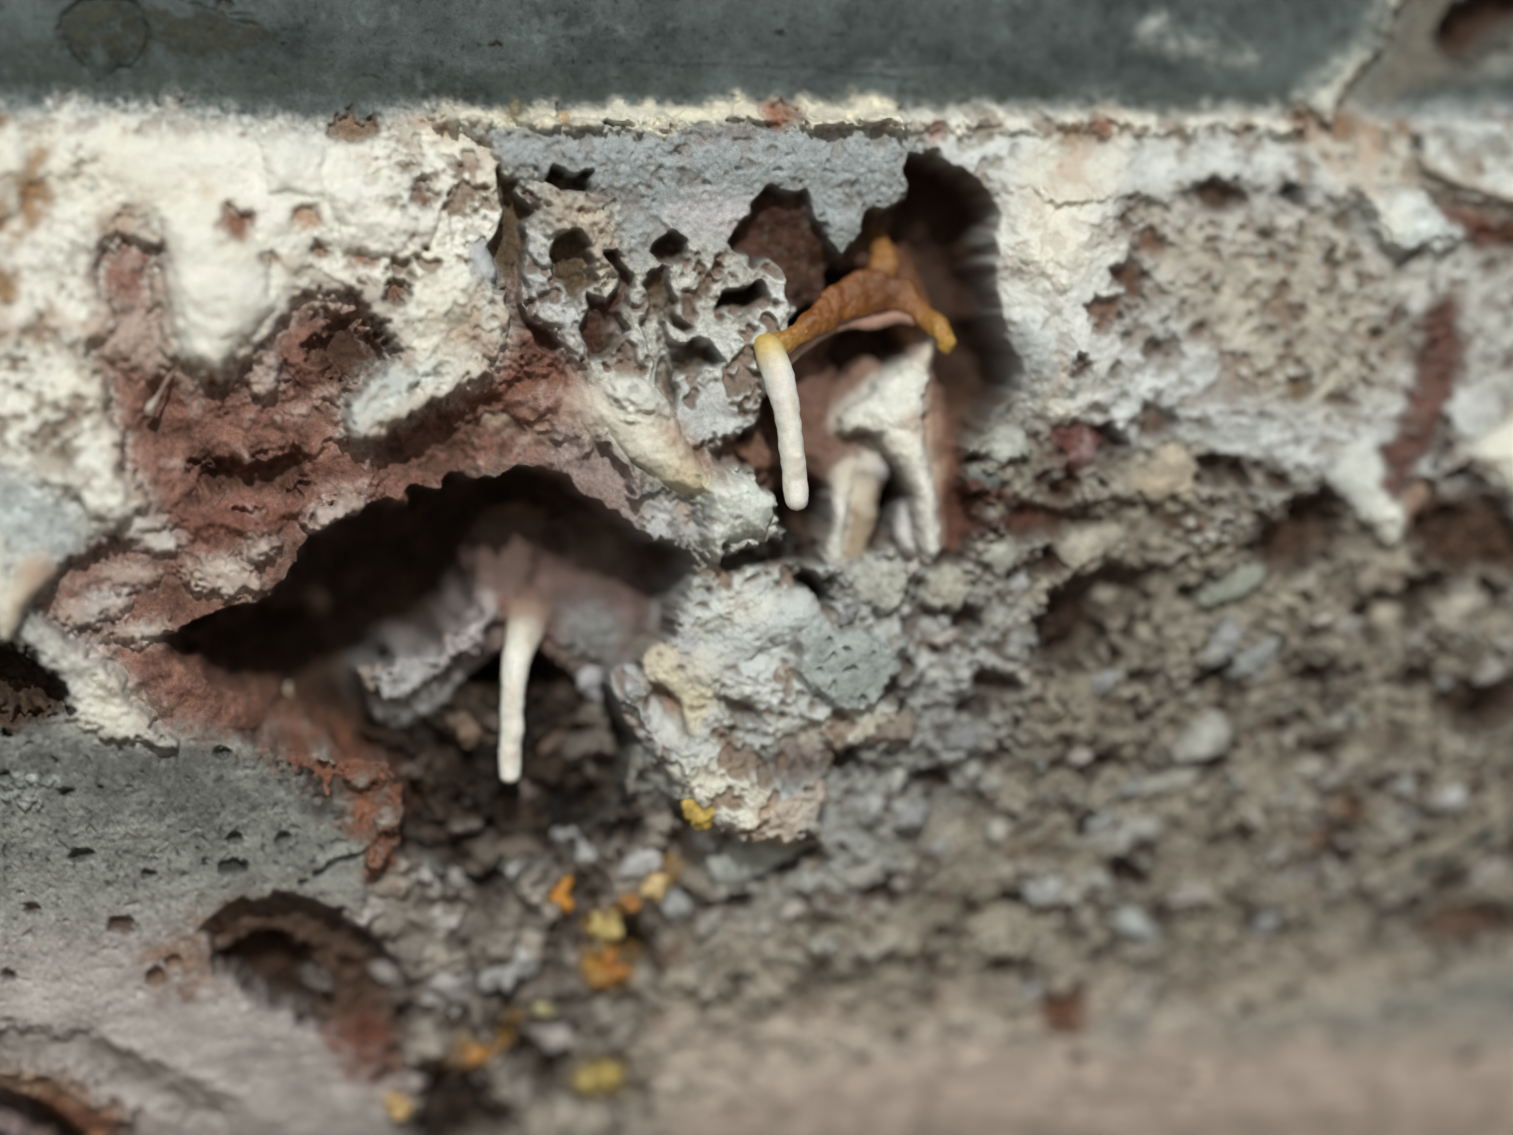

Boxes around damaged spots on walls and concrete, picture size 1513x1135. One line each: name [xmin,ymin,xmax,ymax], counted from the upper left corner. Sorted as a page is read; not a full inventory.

crack [1333,0,1413,123]
spalling [1432,0,1513,65]
spalling [216,203,256,245]
spalling [291,205,382,270]
spalling [328,114,381,144]
spalling [396,158,432,211]
leakage [0,0,1513,541]
corrosion [1379,299,1463,500]
spalling [0,640,76,738]
spalling [33,237,728,1135]
spalling [628,158,1513,1112]
corrosion [269,729,403,881]